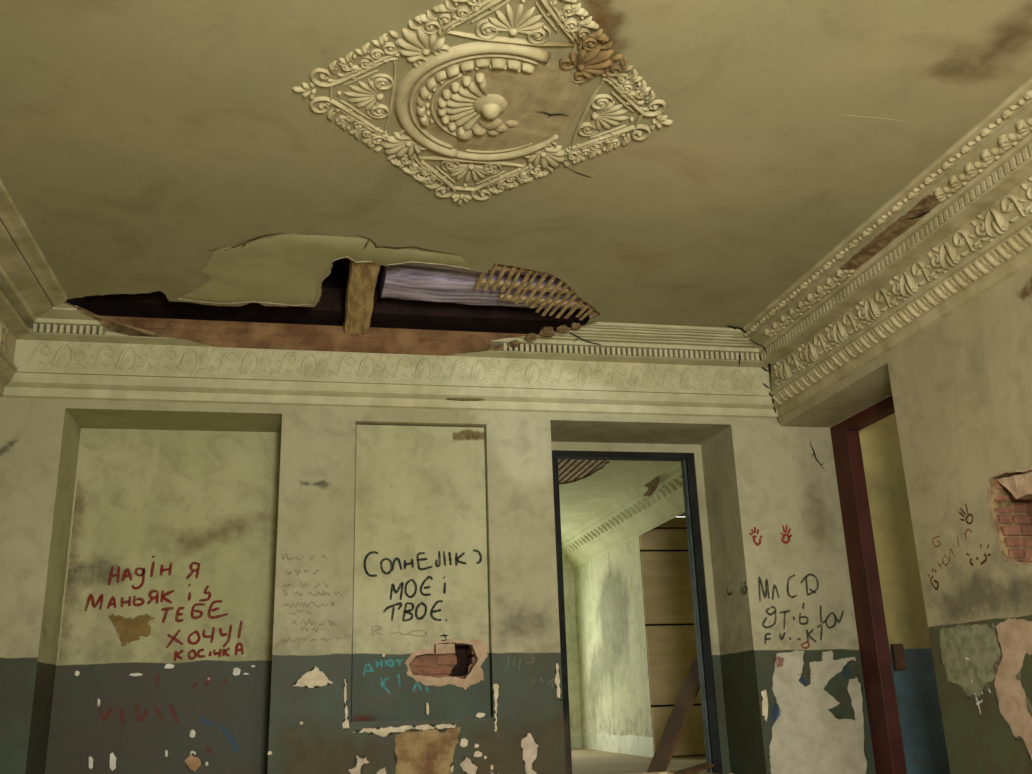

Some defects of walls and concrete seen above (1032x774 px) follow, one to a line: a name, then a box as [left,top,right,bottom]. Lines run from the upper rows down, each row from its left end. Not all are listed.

spalling [322,258,351,289]
spalling [375,265,384,290]
flaking render [100,316,537,356]
spalling [987,468,1032,566]
peeling [108,612,155,647]
flaking render [293,666,498,774]
spalling [405,639,500,731]
peeling [521,733,540,774]
peeling [761,649,868,774]
peeling [940,618,1032,764]